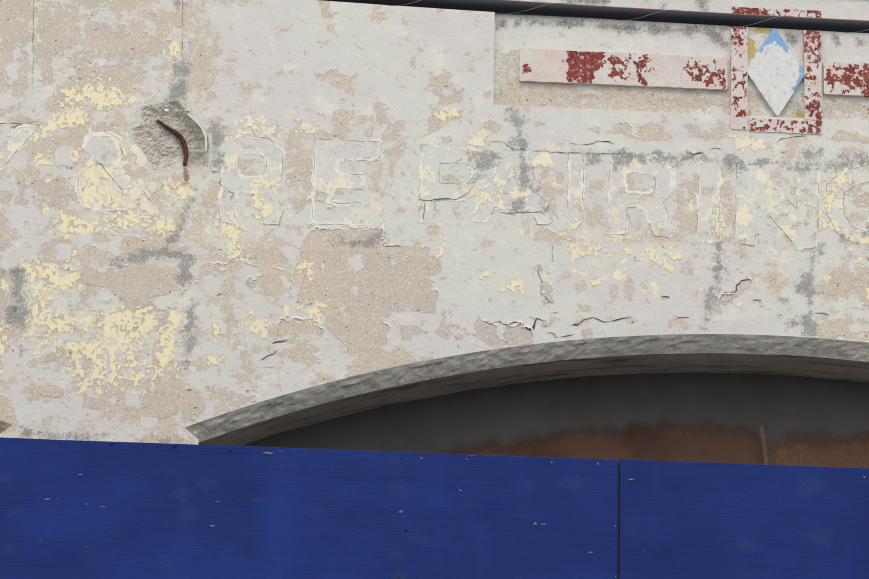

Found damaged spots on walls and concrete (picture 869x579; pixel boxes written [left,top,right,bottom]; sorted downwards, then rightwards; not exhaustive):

peeling [731,27,772,59]
peeling [732,7,821,18]
peeling [804,30,821,51]
peeling [483,43,869,152]
peeling [193,67,561,377]
peeling [522,179,686,277]
peeling [673,172,735,241]
peeling [790,166,869,340]
crack [487,247,628,338]
peeling [574,278,648,312]
peeling [716,277,771,315]
peeling [0,393,19,431]